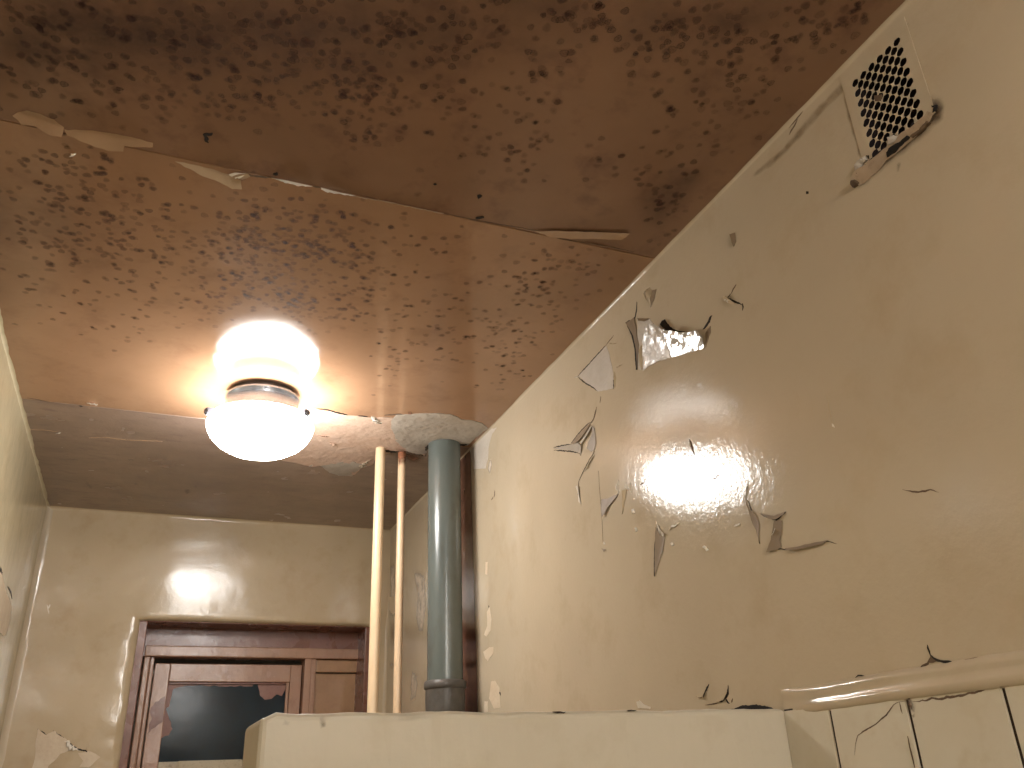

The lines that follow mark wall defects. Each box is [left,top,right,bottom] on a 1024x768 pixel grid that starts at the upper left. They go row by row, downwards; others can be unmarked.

peeling [13,110,153,157]
flaking render [850,105,939,188]
peeling [175,161,632,252]
peeling [625,304,712,370]
peeling [554,335,621,456]
flaking render [278,406,496,476]
peeling [654,522,679,576]
peeling [734,482,835,553]
crack [902,487,936,495]
crack [921,645,976,667]
flaking render [32,729,100,768]
crack [855,701,903,746]